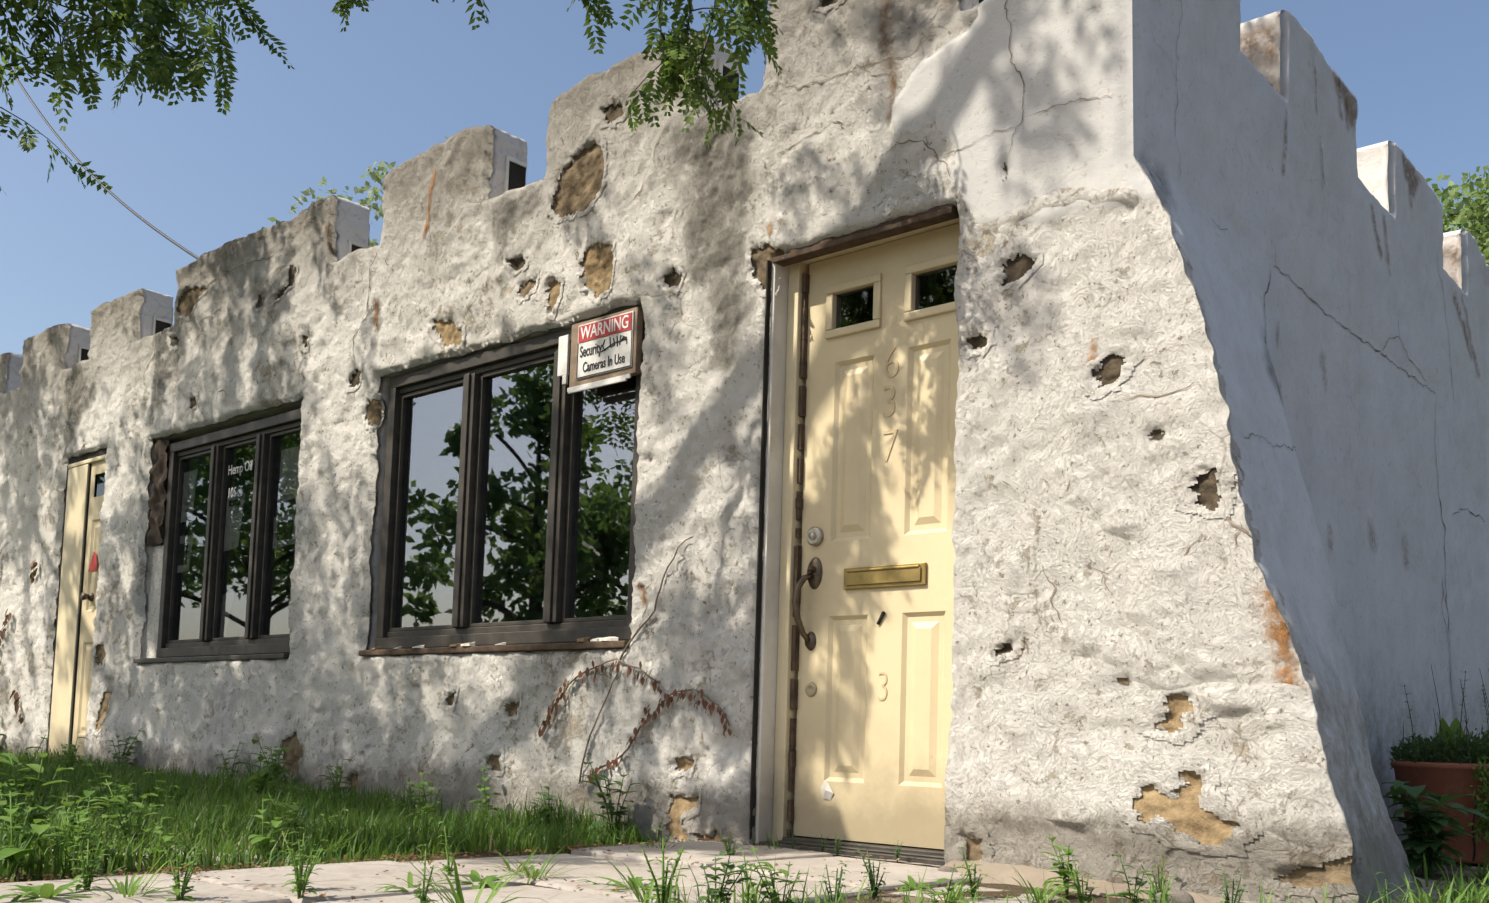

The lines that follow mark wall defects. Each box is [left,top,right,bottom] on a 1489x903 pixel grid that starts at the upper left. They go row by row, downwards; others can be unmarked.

crack [893,0,1113,179]
peeling [545,94,628,224]
peeling [426,311,467,354]
peeling [502,234,616,320]
water stain [669,110,746,369]
spalling [1080,344,1144,400]
spalling [1170,458,1237,519]
crack [1264,243,1485,715]
peeling [660,743,743,844]
peeling [1108,686,1357,900]